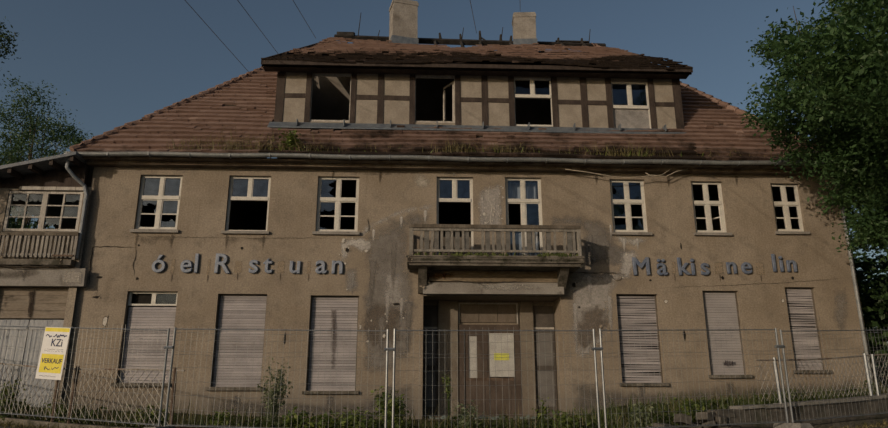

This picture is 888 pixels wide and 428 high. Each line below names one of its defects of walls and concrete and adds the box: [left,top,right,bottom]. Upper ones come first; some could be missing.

peeling [339,237,371,265]
water stain [363,206,430,369]
peeling [478,185,504,225]
water stain [554,219,643,356]